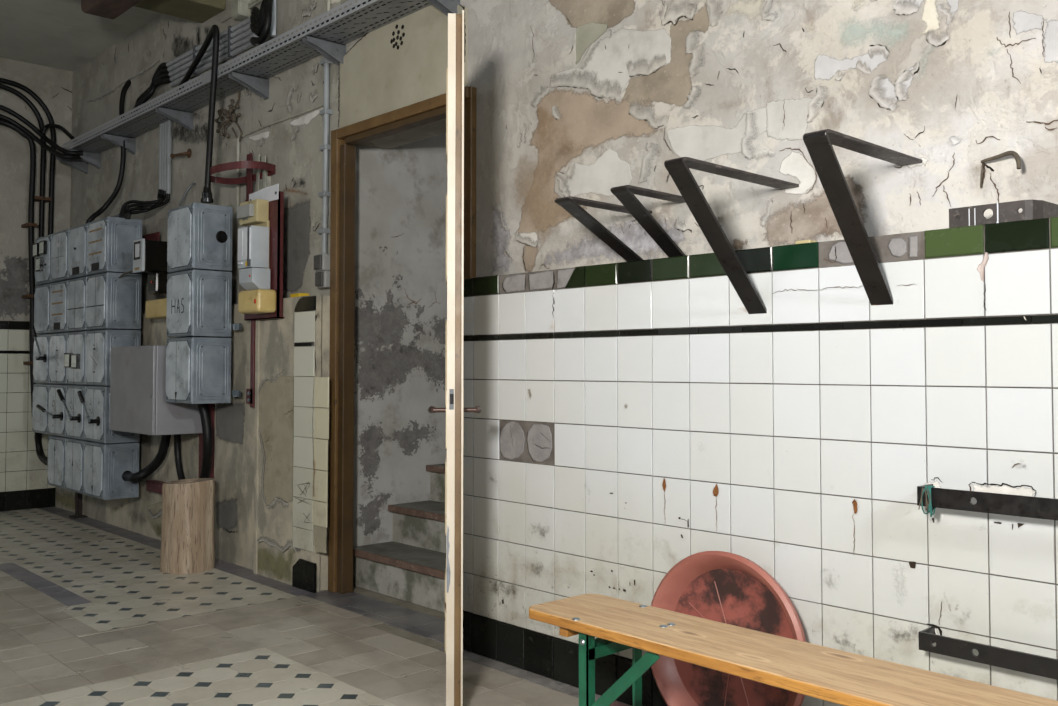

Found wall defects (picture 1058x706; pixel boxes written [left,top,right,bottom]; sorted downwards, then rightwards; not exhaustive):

peeling [892,0,959,47]
peeling [1008,11,1058,73]
peeling [502,0,920,293]
leakage [0,256,30,320]
flaking render [969,482,1036,497]